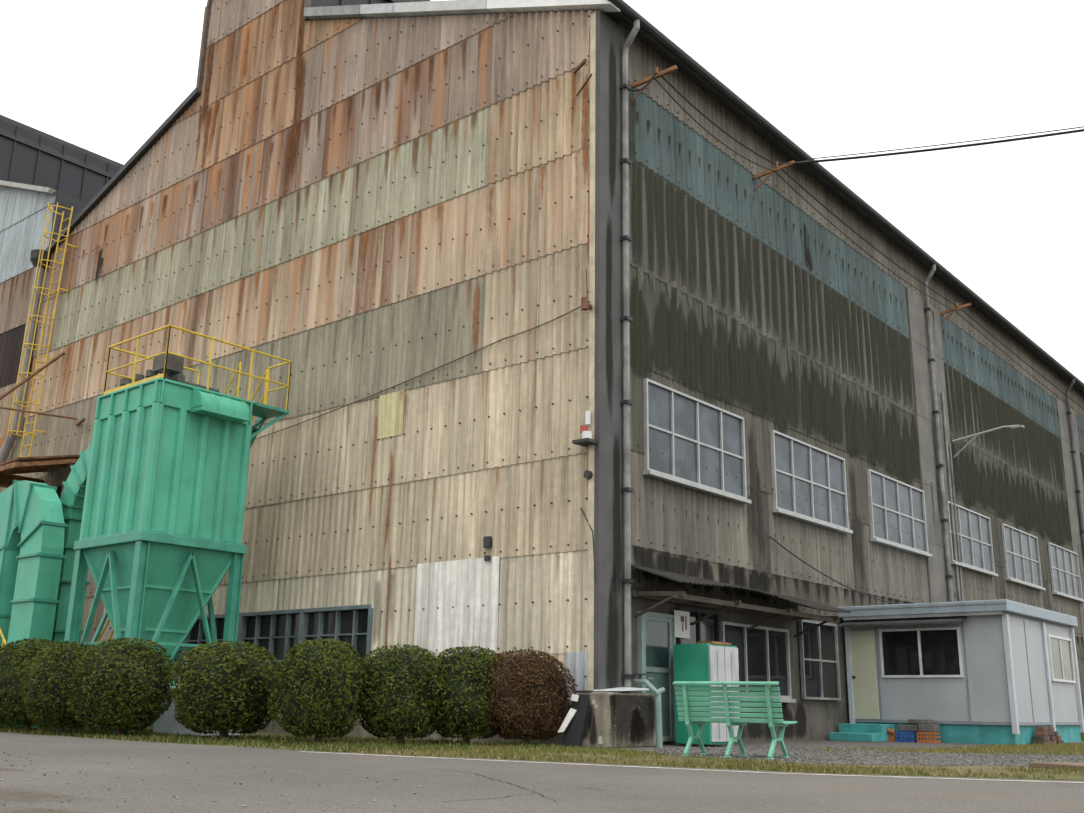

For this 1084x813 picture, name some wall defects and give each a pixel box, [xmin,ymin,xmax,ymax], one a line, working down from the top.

corrosion [196,43,219,168]
corrosion [296,161,368,228]
corrosion [285,0,388,184]
corrosion [412,131,431,171]
corrosion [404,49,447,115]
corrosion [556,66,590,256]
leakage [609,48,920,485]
corrosion [369,417,393,540]
leakage [931,426,941,523]
leakage [944,363,1084,571]
leakage [607,431,914,745]
leakage [583,701,597,744]